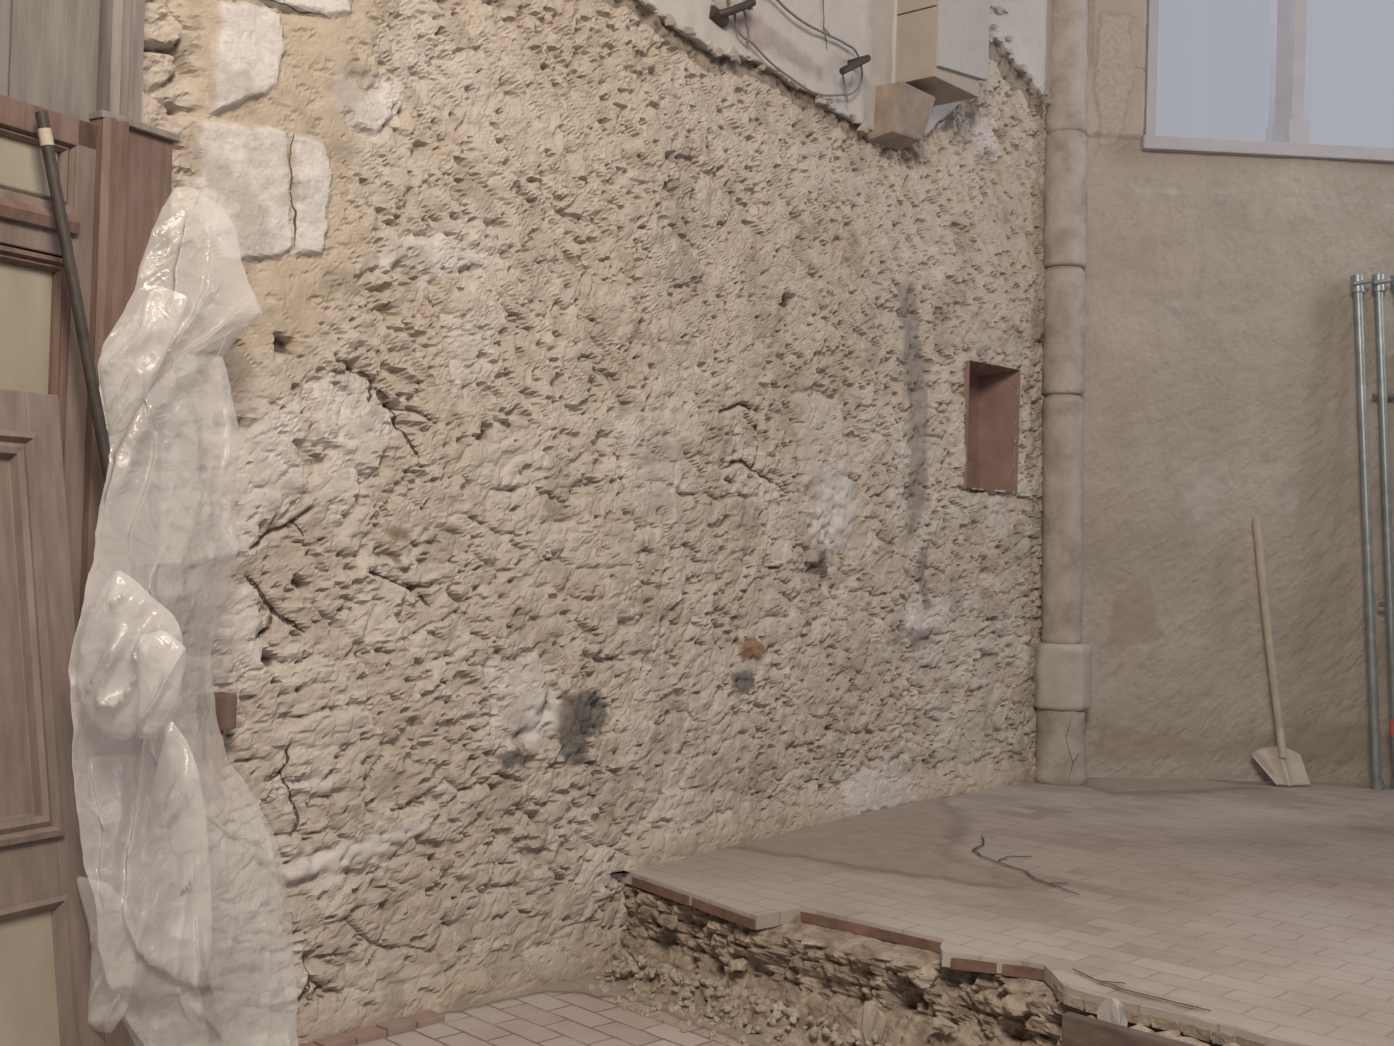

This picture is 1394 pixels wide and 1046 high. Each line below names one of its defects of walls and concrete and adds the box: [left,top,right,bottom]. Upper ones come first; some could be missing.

spalling [603,0,870,139]
spalling [989,1,1054,120]
crack [335,359,437,456]
crack [246,506,315,639]
crack [369,571,432,607]
crack [266,746,300,835]
crack [972,835,1079,895]
crack [301,954,323,994]